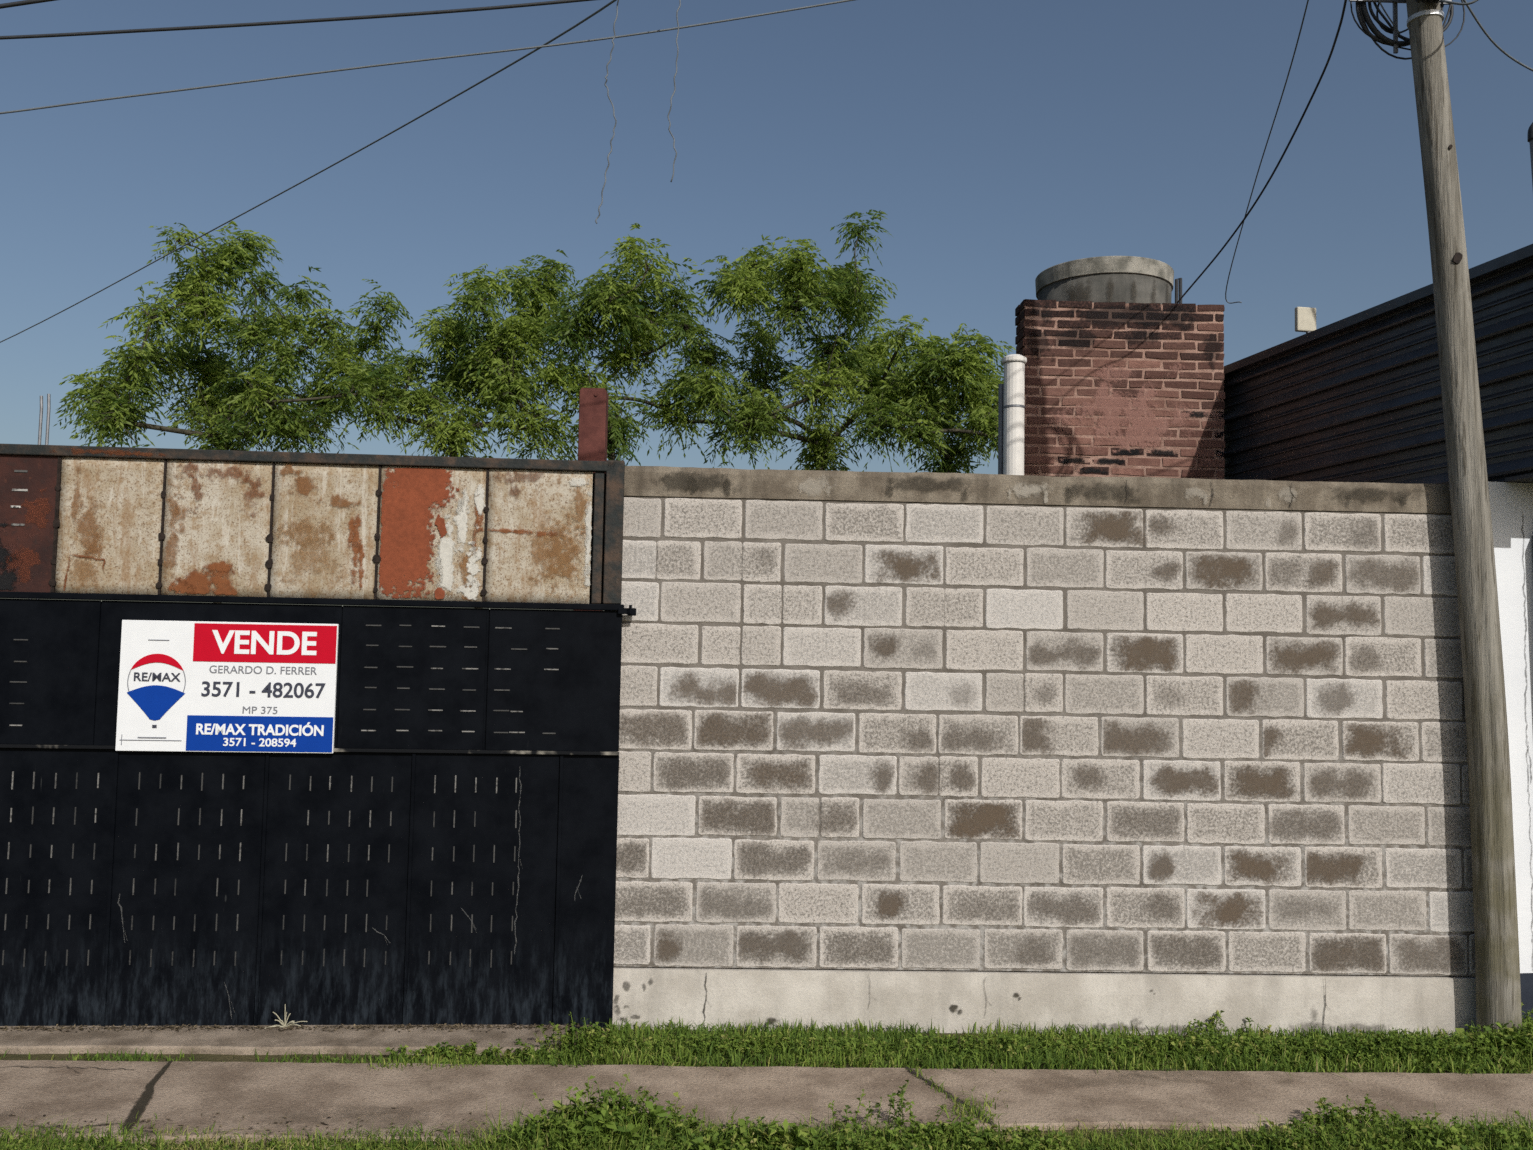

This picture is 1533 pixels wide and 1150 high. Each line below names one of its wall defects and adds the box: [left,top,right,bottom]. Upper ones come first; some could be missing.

rust [63,491,105,591]
rust [164,463,264,595]
rust [280,464,587,600]
peeling [435,484,486,600]
leakage [1066,485,1170,545]
leakage [1119,636,1177,671]
leakage [1270,603,1380,673]
leakage [675,672,853,747]
leakage [1104,720,1294,799]
leakage [1312,724,1405,797]
leakage [919,767,1020,838]
leakage [1198,851,1289,927]